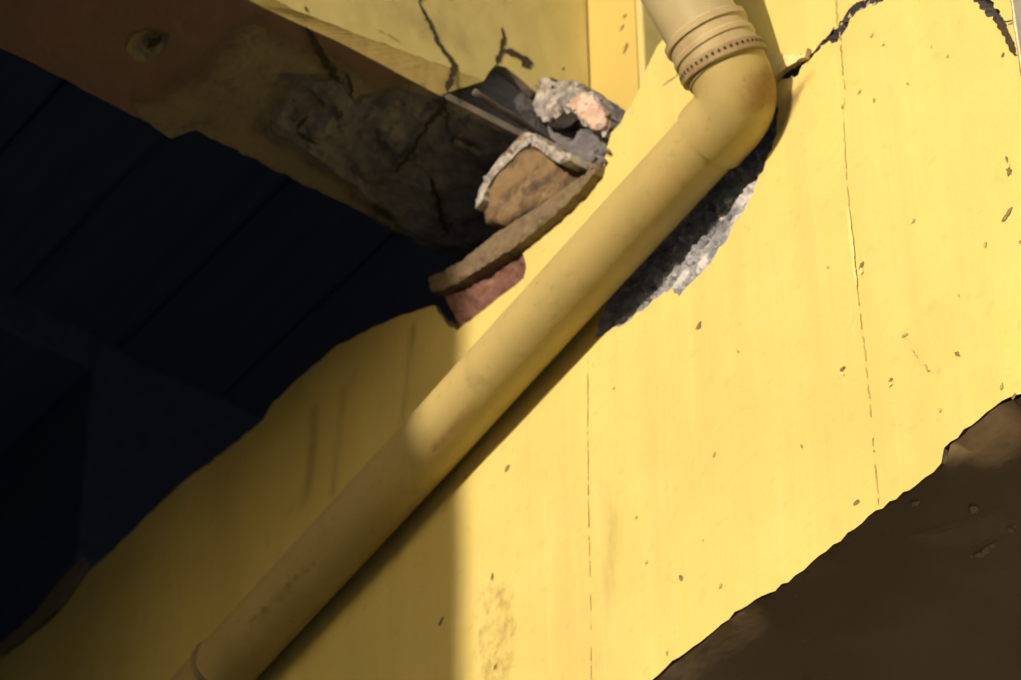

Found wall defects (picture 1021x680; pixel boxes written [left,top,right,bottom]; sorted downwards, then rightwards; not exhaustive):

crack [305,26,354,99]
crack [394,0,459,174]
crack [495,0,533,69]
crack [973,0,1021,55]
crack [429,176,449,235]
spalling [257,67,626,327]
spalling [595,105,778,338]
crack [781,0,884,505]